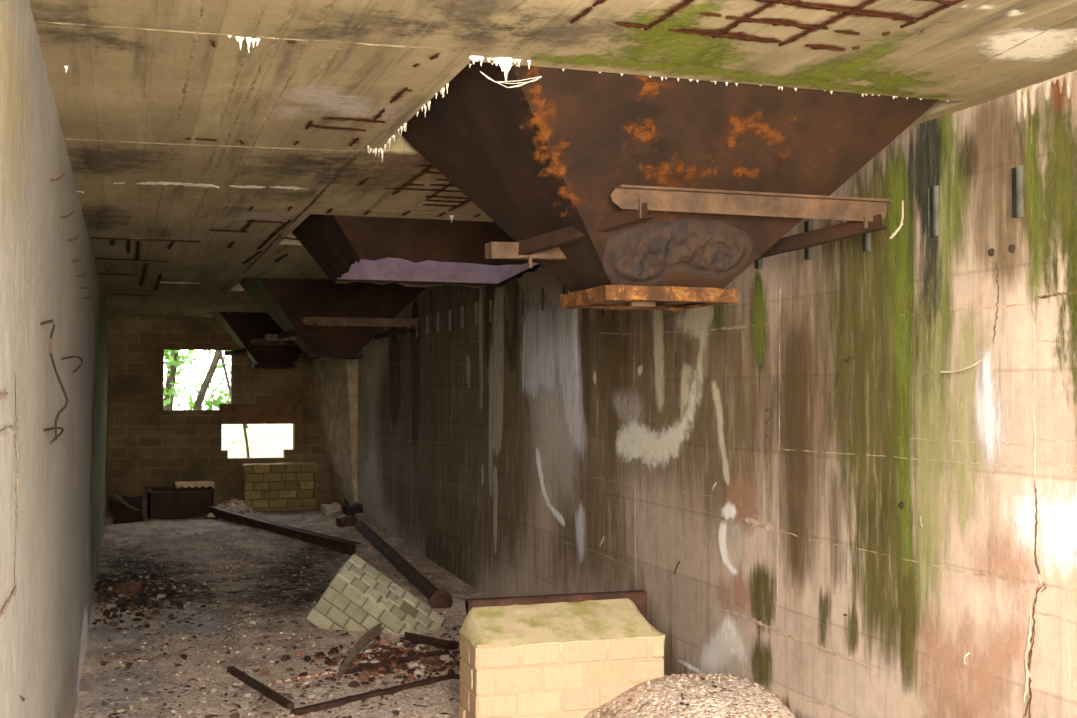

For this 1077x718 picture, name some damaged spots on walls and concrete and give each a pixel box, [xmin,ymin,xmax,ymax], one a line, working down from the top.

rust [523,66,578,204]
water stain [909,119,942,307]
water stain [960,70,1077,277]
water stain [357,280,766,583]
water stain [784,272,828,575]
water stain [976,354,1001,459]
water stain [665,616,744,675]
crack [1023,484,1046,718]
water stain [1015,490,1077,568]